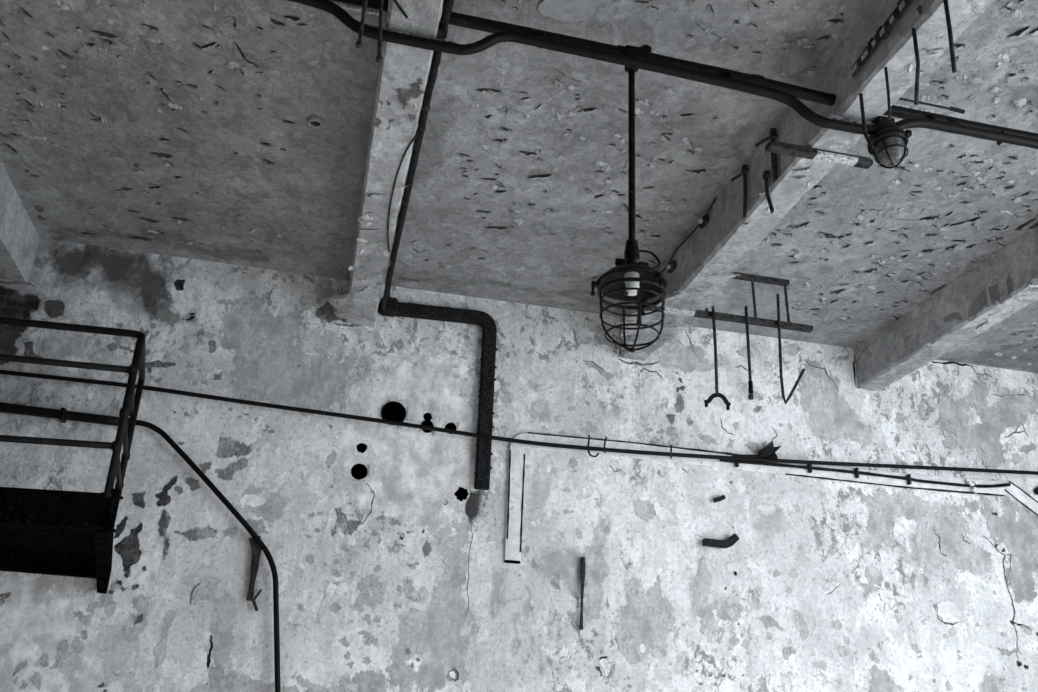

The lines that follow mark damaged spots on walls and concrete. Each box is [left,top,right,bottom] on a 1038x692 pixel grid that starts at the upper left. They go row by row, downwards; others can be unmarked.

peeling [0,0,191,155]
peeling [143,4,302,114]
peeling [256,12,317,33]
peeling [733,0,850,82]
flaking render [0,285,65,365]
leakage [51,245,185,326]
peeling [53,209,291,262]
peeling [132,436,291,560]
peeling [13,516,174,690]
crack [983,536,1038,669]